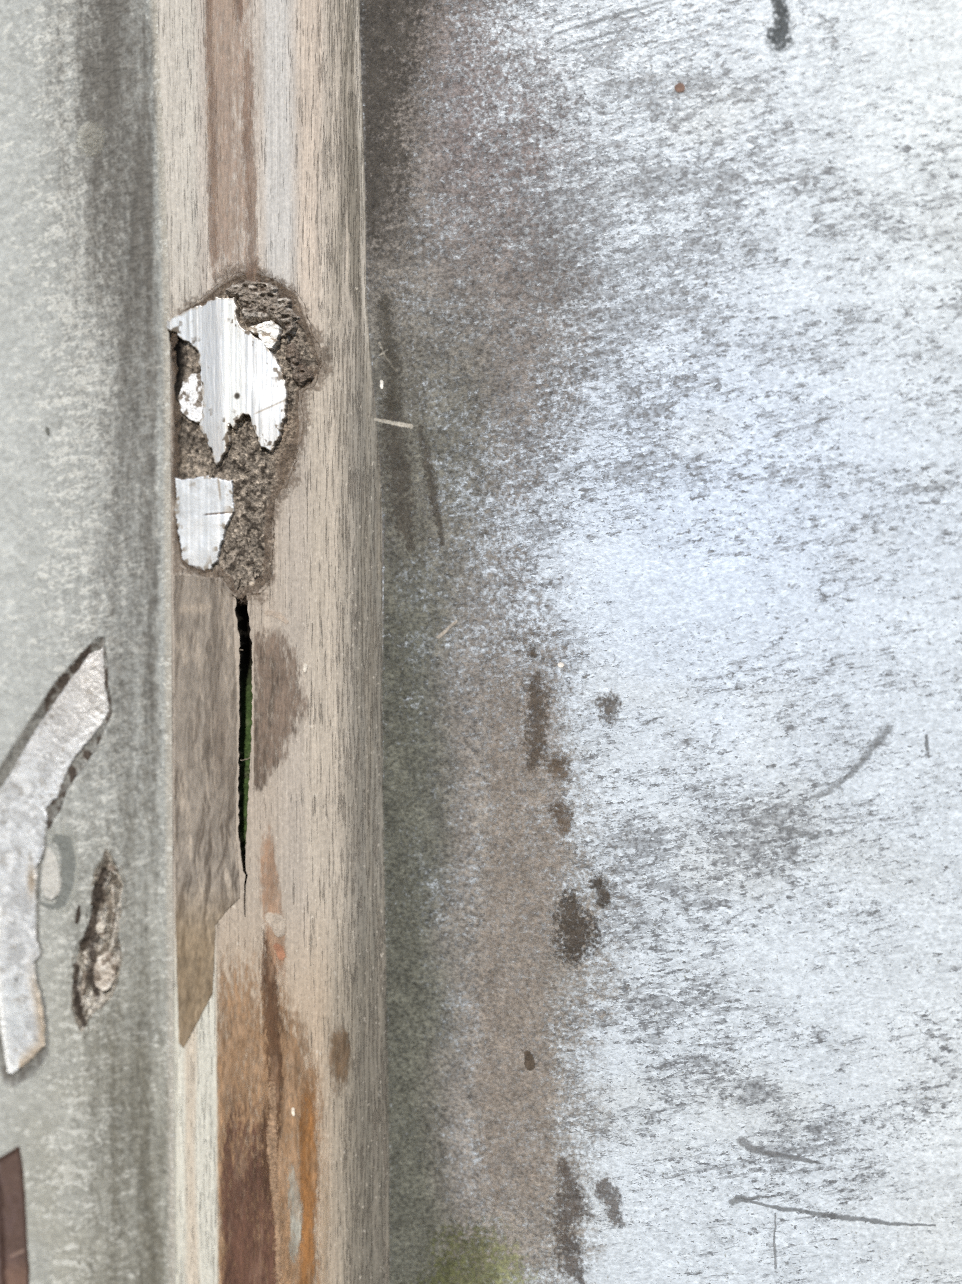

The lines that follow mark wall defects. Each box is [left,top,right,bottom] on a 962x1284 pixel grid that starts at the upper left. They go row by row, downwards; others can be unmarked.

peeling [0,637,112,1087]
spalling [71,844,126,1039]
spalling [166,269,322,1048]
crack [235,577,253,915]
damp [254,632,307,790]
corrosion [217,840,350,1284]
damp [359,0,624,1284]